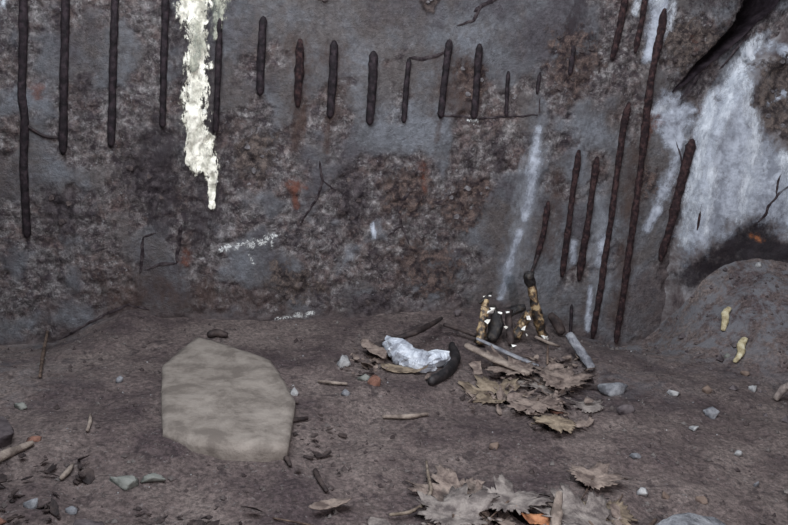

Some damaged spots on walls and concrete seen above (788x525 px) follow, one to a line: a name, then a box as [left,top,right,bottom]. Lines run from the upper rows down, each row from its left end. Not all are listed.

water stain [160,0,229,245]
crack [456,0,496,26]
spalling [540,18,611,105]
water stain [643,30,788,287]